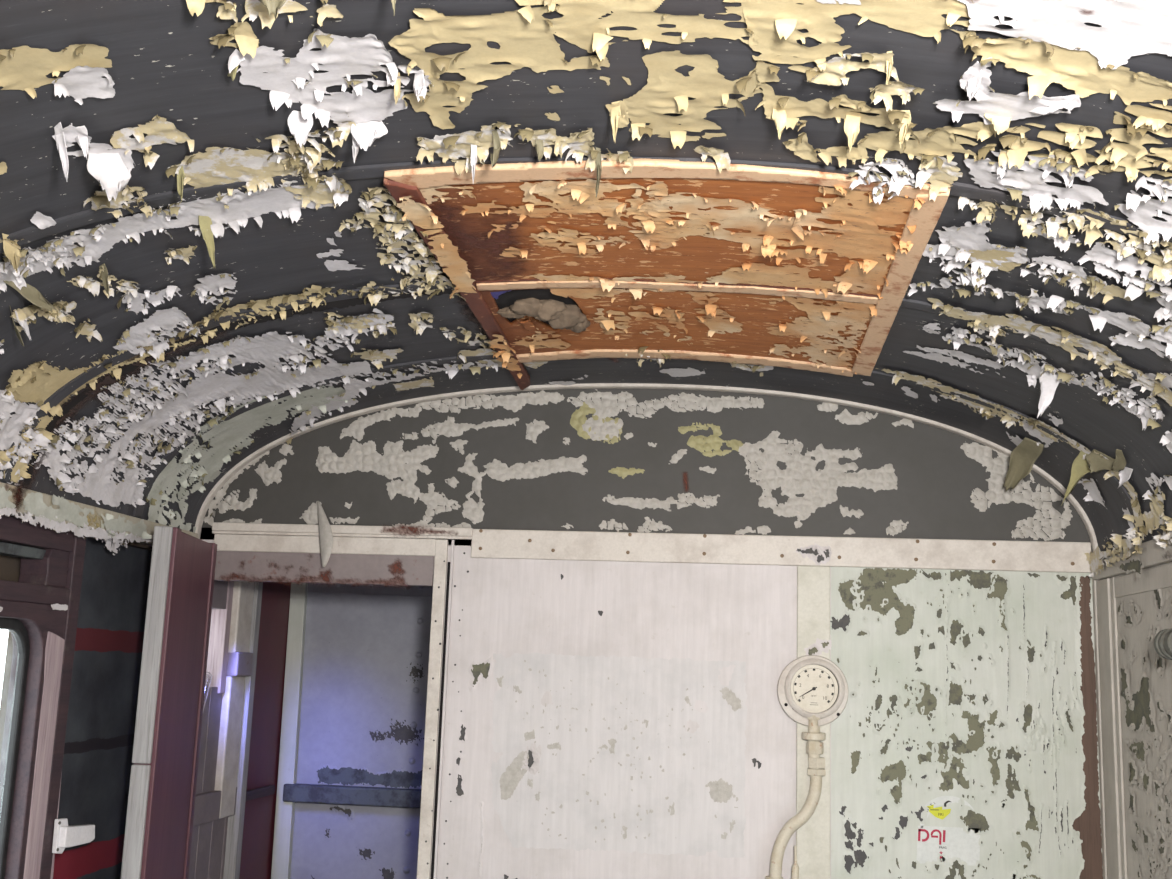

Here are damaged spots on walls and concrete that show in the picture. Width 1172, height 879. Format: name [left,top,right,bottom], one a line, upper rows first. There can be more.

peeling [804,638,832,656]